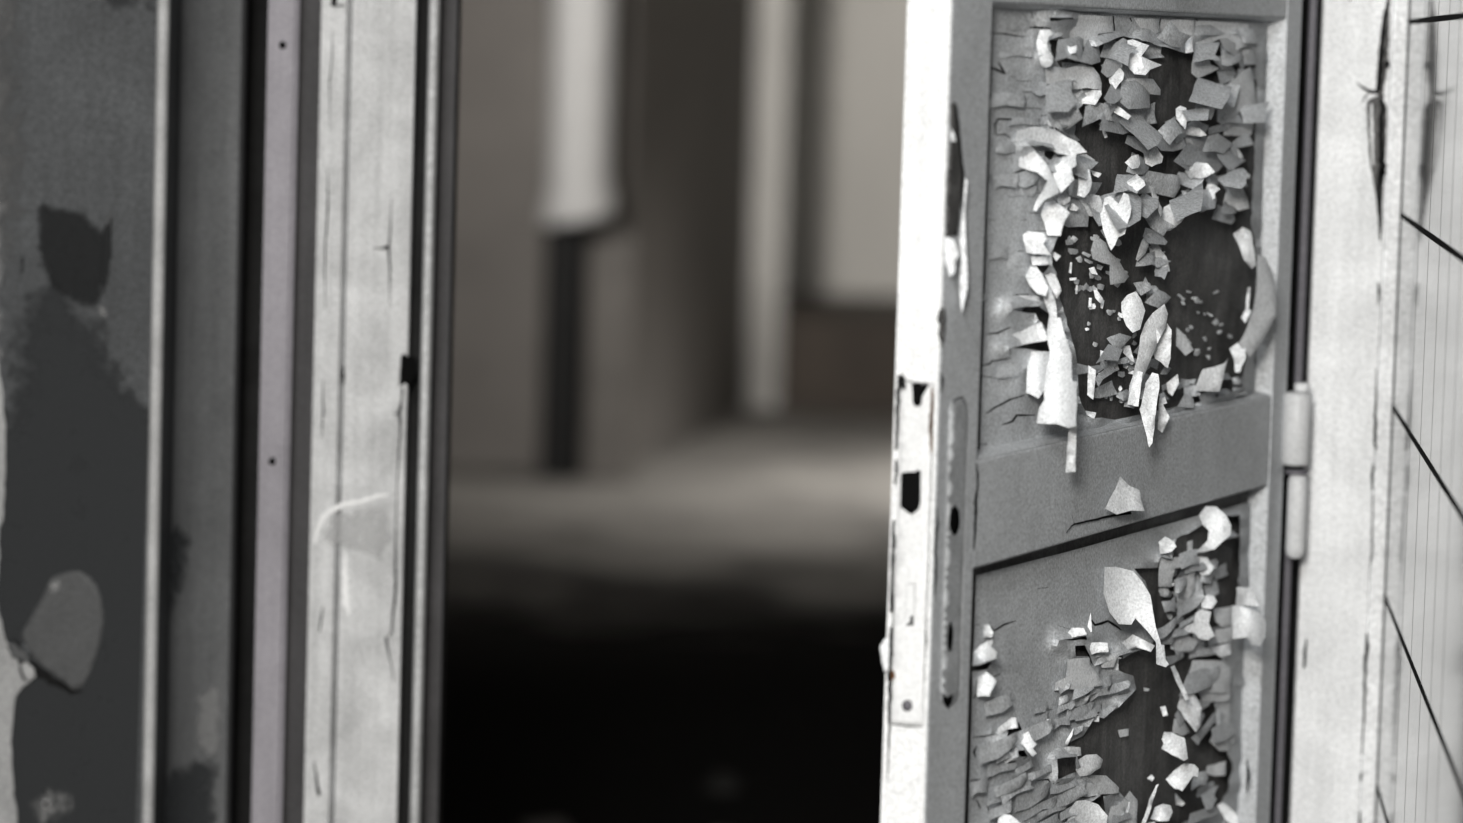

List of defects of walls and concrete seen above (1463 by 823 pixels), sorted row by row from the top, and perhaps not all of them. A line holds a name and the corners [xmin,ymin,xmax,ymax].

peeling [39,205,112,316]
peeling [937,8,1277,472]
peeling [1066,477,1144,533]
flaking render [0,618,36,823]
peeling [968,502,1266,823]